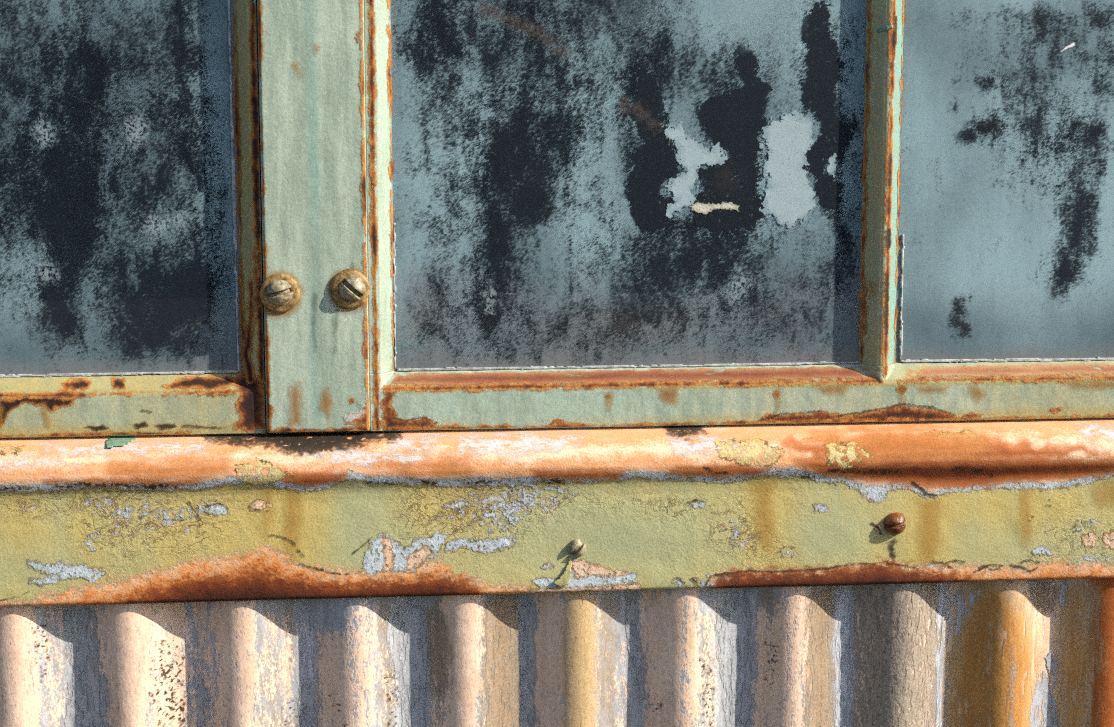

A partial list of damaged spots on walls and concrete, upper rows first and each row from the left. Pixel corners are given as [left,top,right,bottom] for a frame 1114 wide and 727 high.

damp [0,0,236,371]
rust [0,0,1114,437]
damp [392,0,866,365]
damp [951,1,1114,301]
damp [948,296,972,338]
peeling [27,530,106,587]
peeling [60,605,113,727]
rust [0,544,597,727]
peeling [0,419,1114,576]
peeling [518,556,649,726]
peeling [715,595,757,727]
rust [706,557,1114,727]